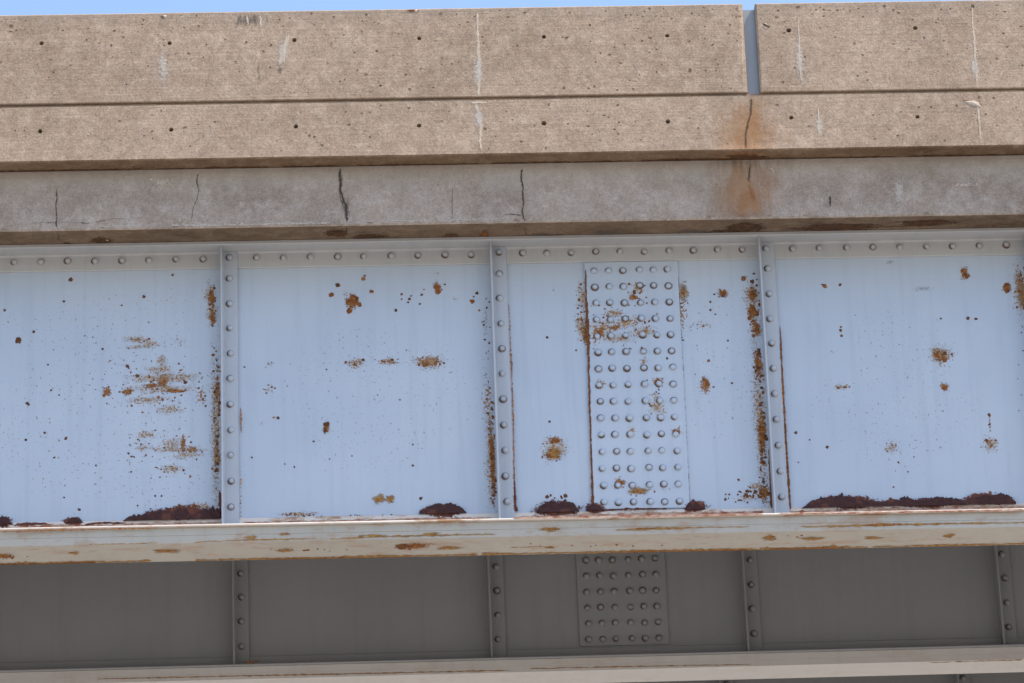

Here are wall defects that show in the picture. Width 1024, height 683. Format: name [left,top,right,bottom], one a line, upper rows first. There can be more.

crack [745,99,754,198]
crack [339,169,350,234]
crack [512,169,526,234]
corrosion [0,294,222,532]
corrosion [194,265,1024,561]